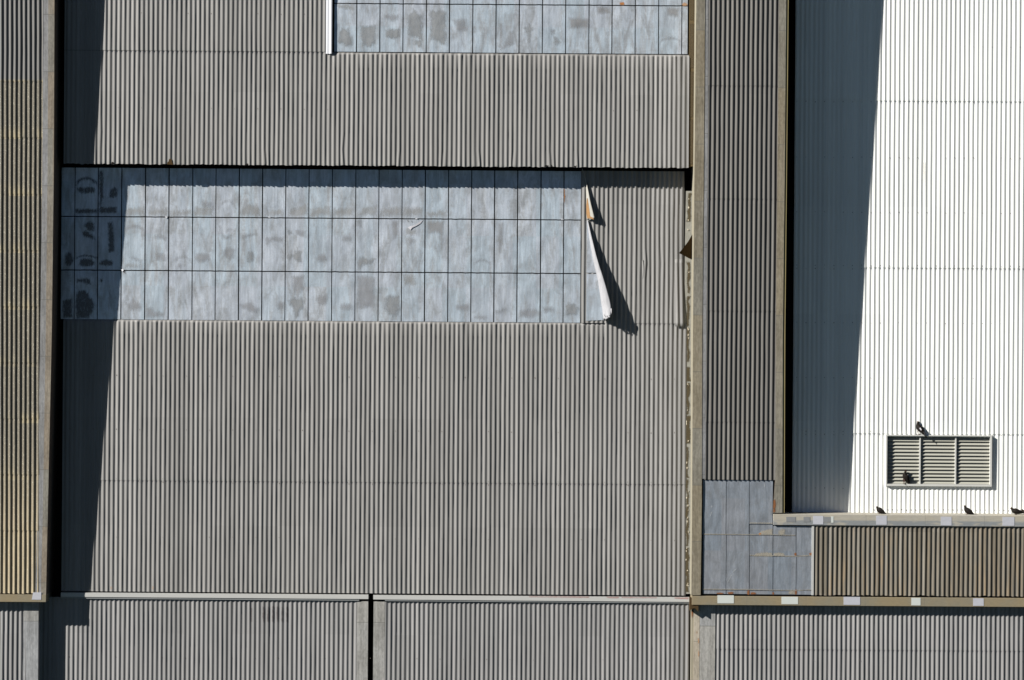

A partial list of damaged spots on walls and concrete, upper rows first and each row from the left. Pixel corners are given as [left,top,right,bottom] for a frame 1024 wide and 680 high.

peeling [582,169,612,321]